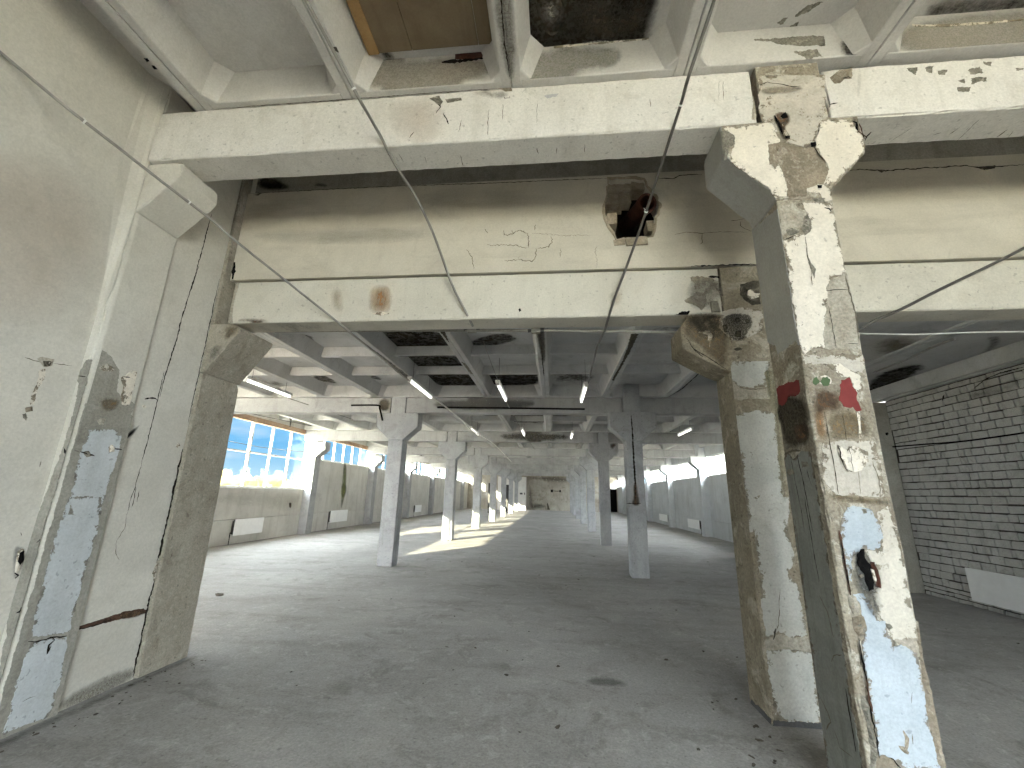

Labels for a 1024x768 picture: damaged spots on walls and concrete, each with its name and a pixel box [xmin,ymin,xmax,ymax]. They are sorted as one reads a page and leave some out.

peeling [957,61,992,92]
spalling [602,176,662,246]
crack [467,225,597,268]
corrosion [375,290,387,308]
crack [115,214,220,559]
damp [776,396,808,447]
peeling [676,66,947,768]
peeling [0,350,137,740]
crack [133,449,183,676]
corrosion [79,608,146,630]